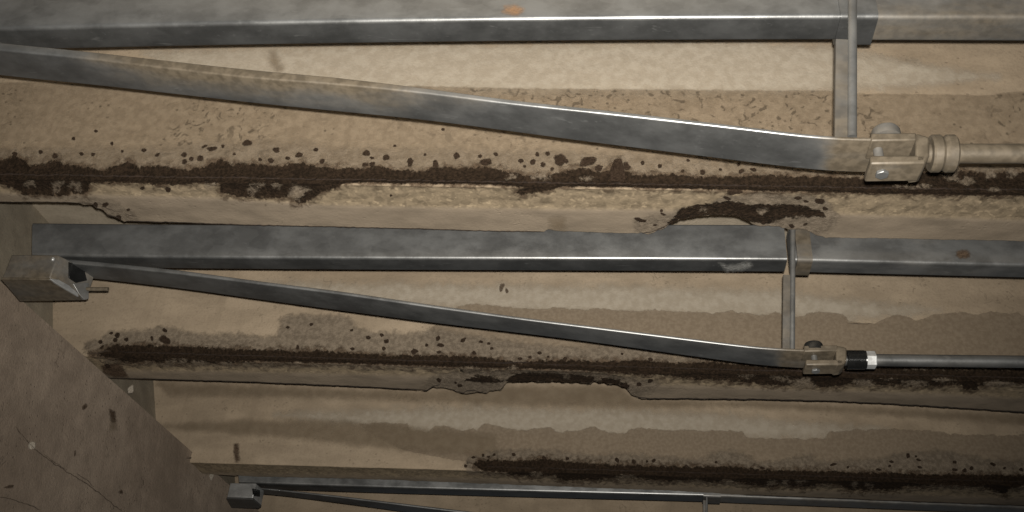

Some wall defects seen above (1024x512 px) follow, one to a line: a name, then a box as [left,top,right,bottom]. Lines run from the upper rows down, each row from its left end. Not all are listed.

spalling [0,140,1024,234]
water stain [295,284,782,351]
spalling [85,314,1024,395]
water stain [643,349,803,370]
water stain [795,296,1024,370]